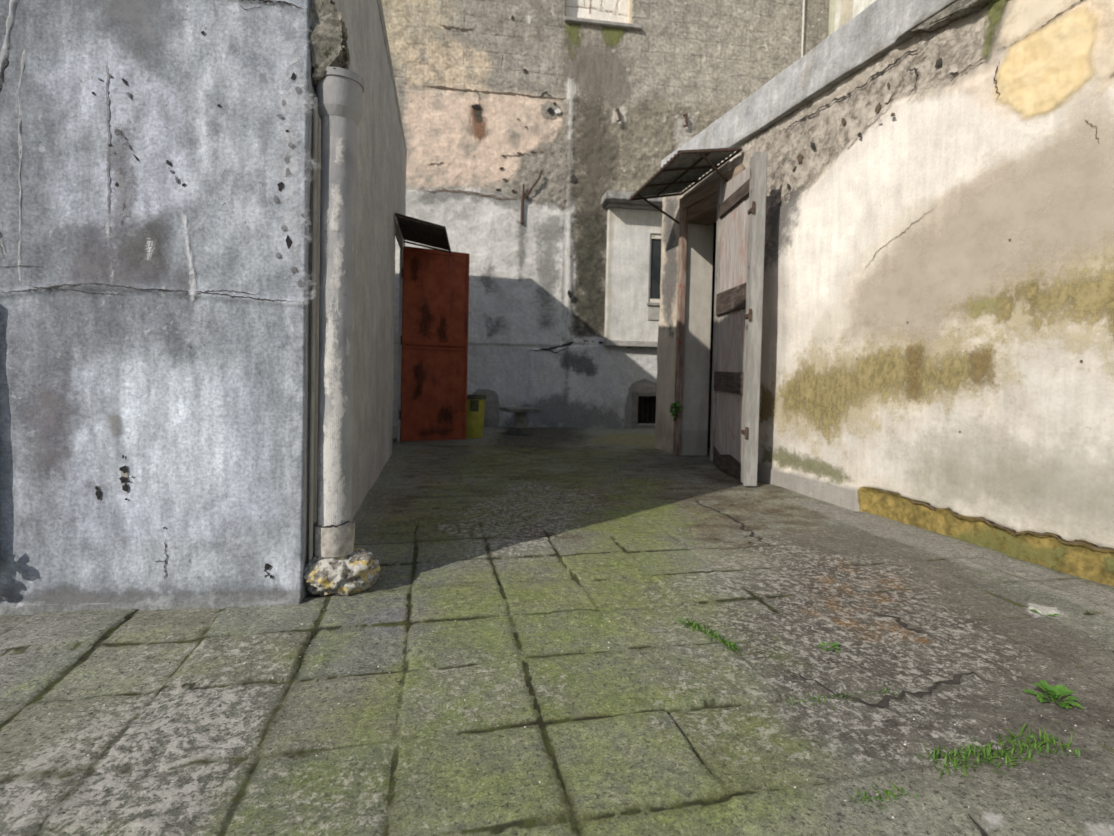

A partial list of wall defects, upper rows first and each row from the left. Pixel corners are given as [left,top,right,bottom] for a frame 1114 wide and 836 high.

crack [242,0,306,10]
peeling [744,0,1114,207]
peeling [274,43,307,258]
damp [518,42,628,375]
damp [859,111,1114,330]
crack [0,265,299,302]
damp [906,346,924,400]
damp [969,350,994,384]
damp [759,386,775,422]
spalling [119,455,132,501]